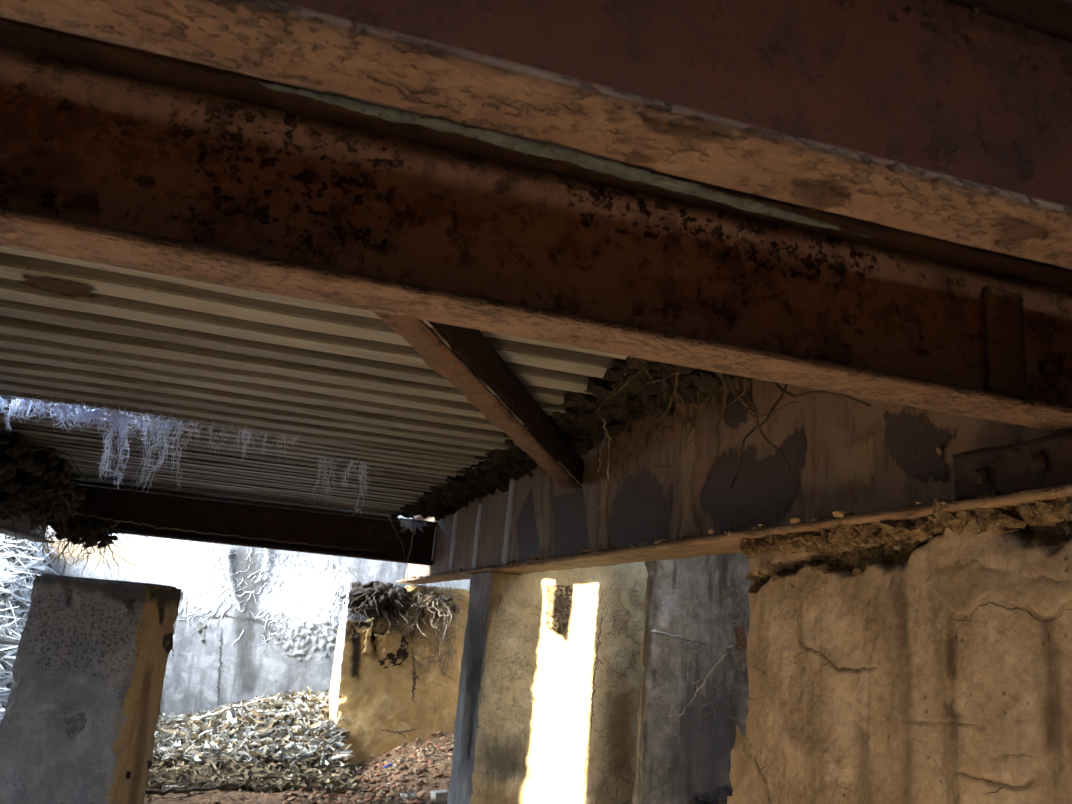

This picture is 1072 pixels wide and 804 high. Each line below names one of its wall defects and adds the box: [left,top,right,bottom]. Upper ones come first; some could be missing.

rust [172,99,404,264]
rust [568,178,879,290]
spalling [1016,518,1072,547]
spalling [378,635,409,669]
crack [797,639,873,687]
crack [954,754,1040,794]